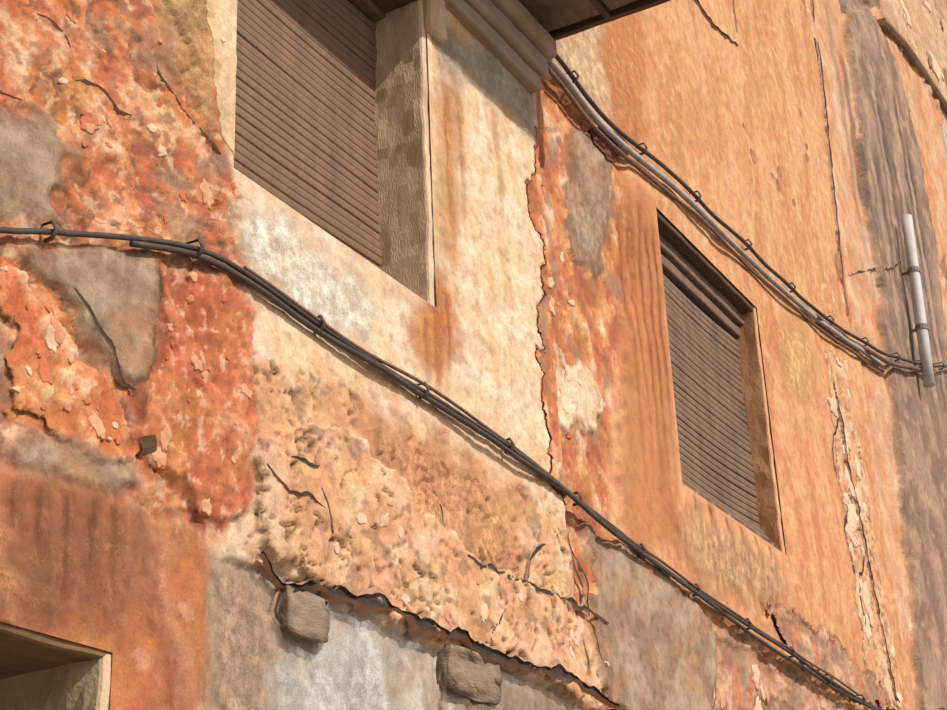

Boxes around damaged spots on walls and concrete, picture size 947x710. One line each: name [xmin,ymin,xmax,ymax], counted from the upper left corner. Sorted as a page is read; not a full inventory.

spalling [0,0,237,245]
crack [694,0,738,46]
crack [810,0,902,316]
water stain [829,23,939,344]
peeling [0,260,142,463]
spalling [256,126,606,702]
crack [258,551,620,710]
crack [468,526,609,660]
spalling [713,634,844,710]
peeling [762,347,903,709]
crack [831,382,900,703]